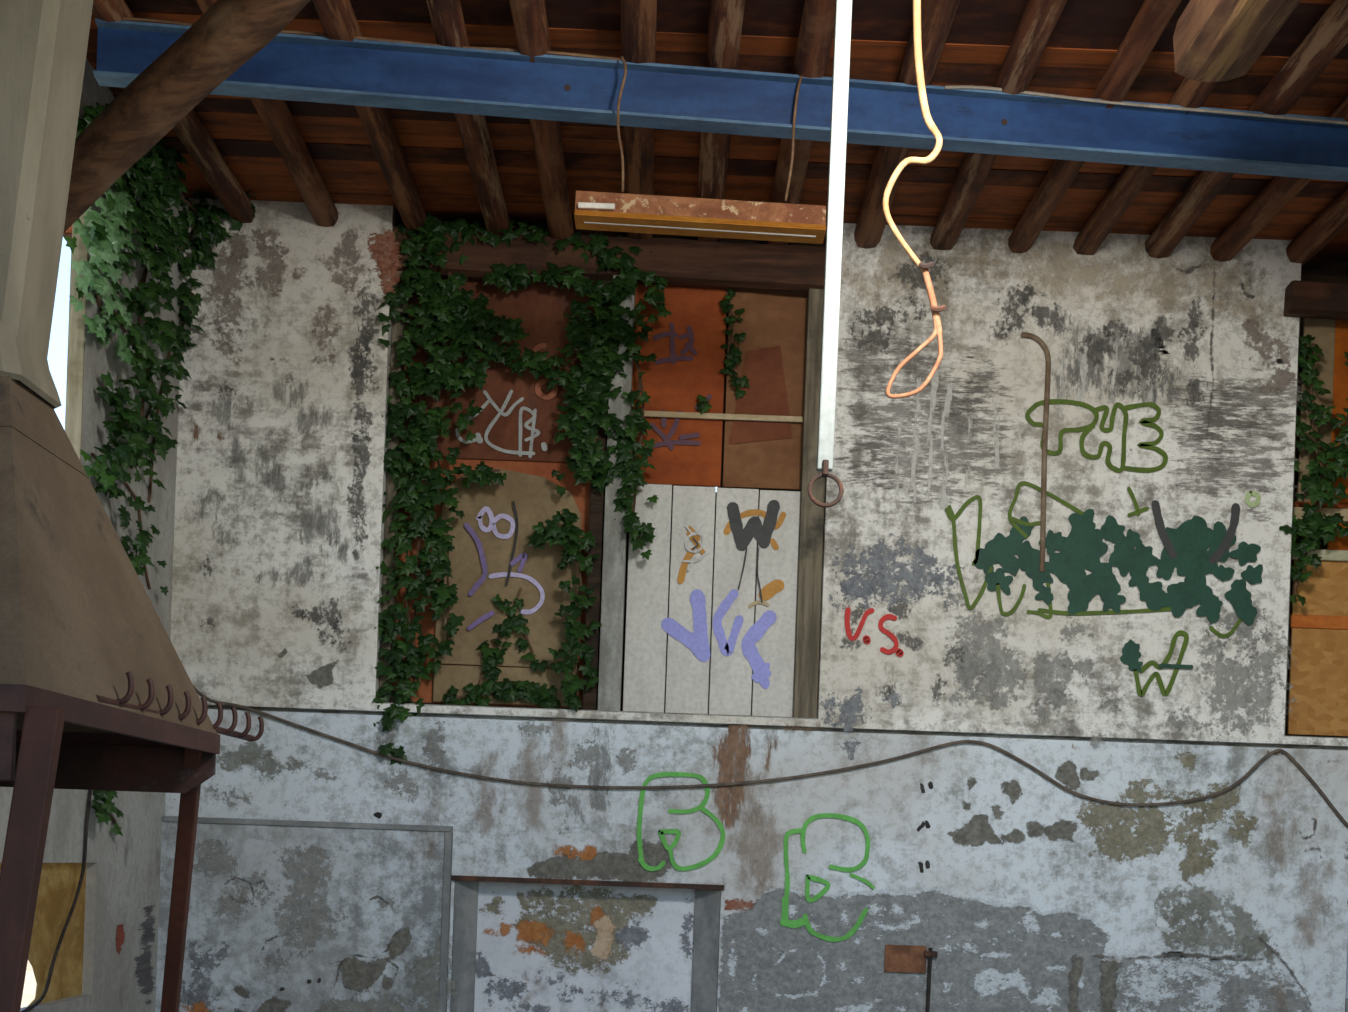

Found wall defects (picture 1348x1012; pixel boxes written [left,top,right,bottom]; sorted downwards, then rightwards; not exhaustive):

flaking render [590,915,617,960]